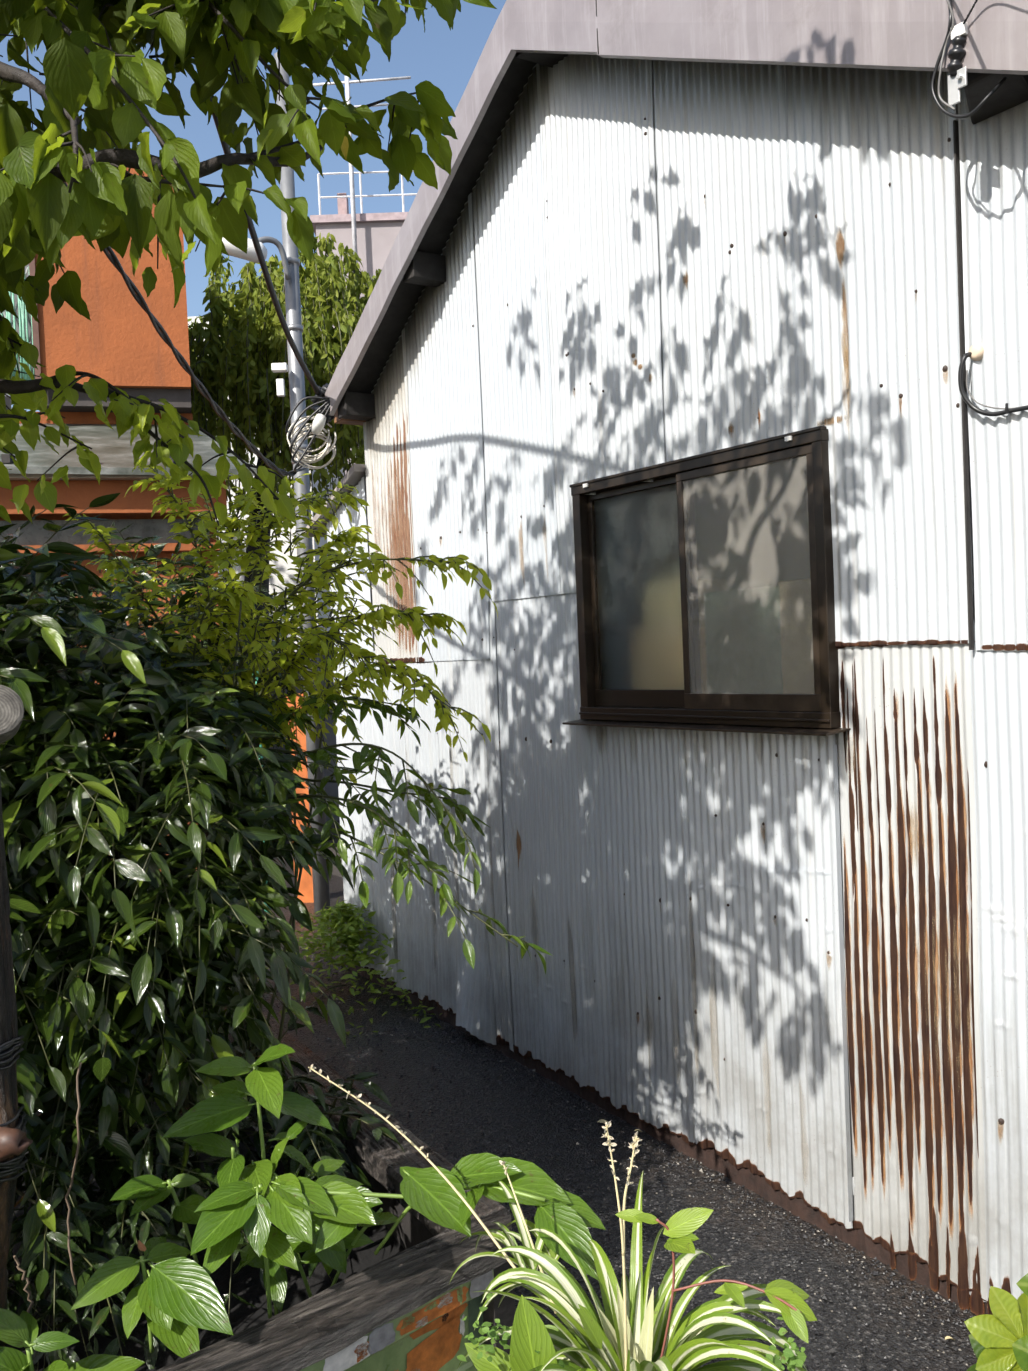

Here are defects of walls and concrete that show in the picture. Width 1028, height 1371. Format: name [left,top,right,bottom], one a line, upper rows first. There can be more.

rust [836,232,844,265]
rust [376,418,425,664]
rust [496,639,1028,1316]